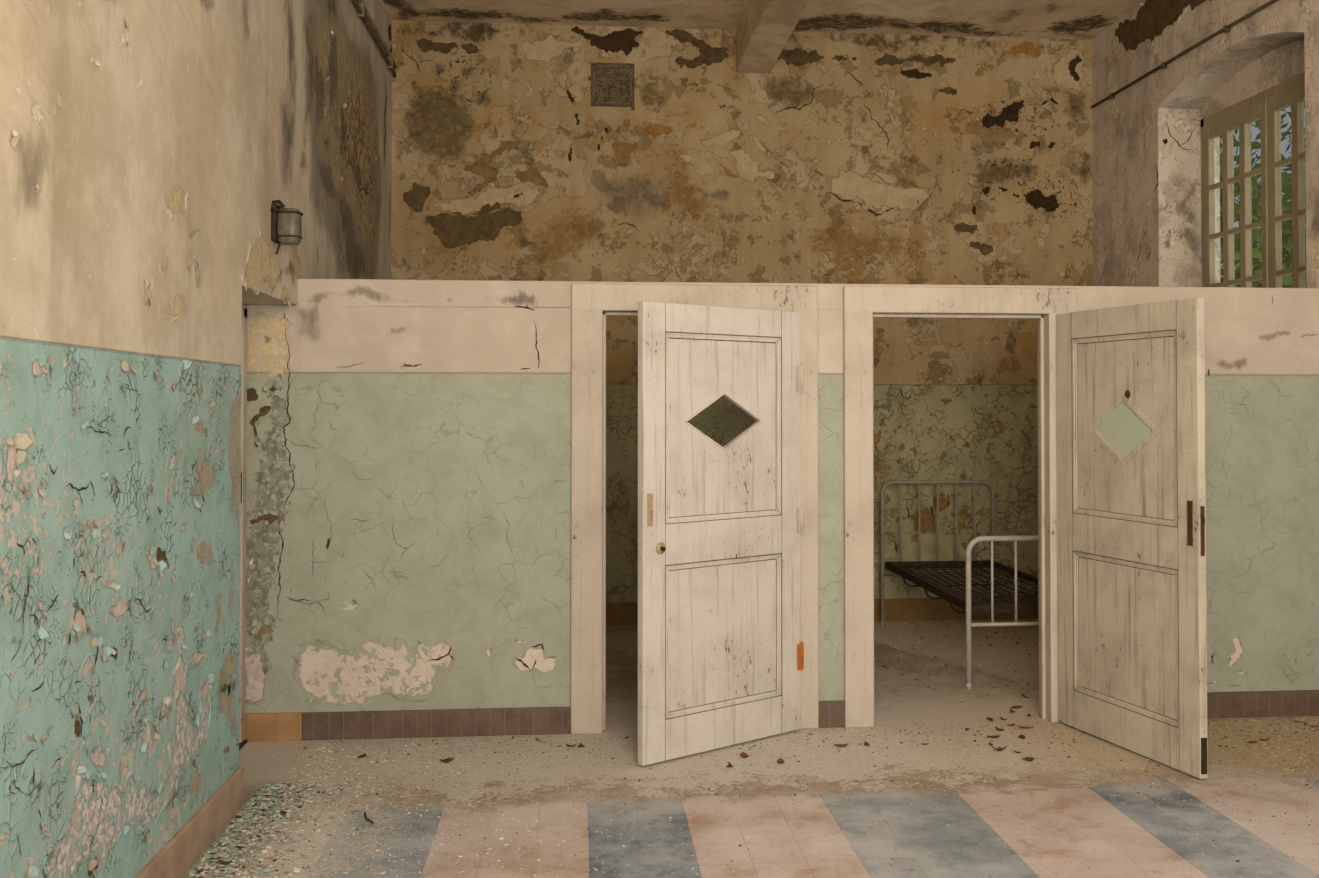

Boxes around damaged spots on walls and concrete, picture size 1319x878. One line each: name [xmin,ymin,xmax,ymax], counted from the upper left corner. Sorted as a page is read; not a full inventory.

peeling [522,26,648,66]
spalling [666,28,729,73]
spalling [775,45,857,66]
spalling [874,54,957,95]
spalling [1115,0,1214,58]
leakage [306,30,372,192]
spalling [403,138,551,253]
crack [86,426,132,452]
crack [48,461,95,504]
peeling [22,229,296,878]
peeling [292,635,453,711]
peeling [511,639,556,676]